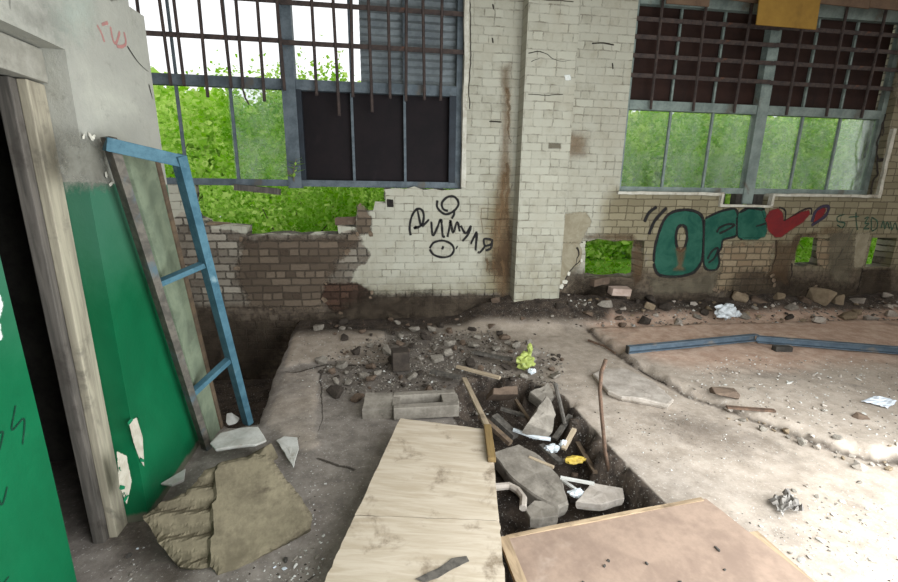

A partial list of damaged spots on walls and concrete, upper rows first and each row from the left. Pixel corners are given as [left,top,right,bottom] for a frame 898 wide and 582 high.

rust [494,71,511,259]
spalling [233,203,373,314]
flaking render [559,242,583,290]
peeling [117,417,144,504]